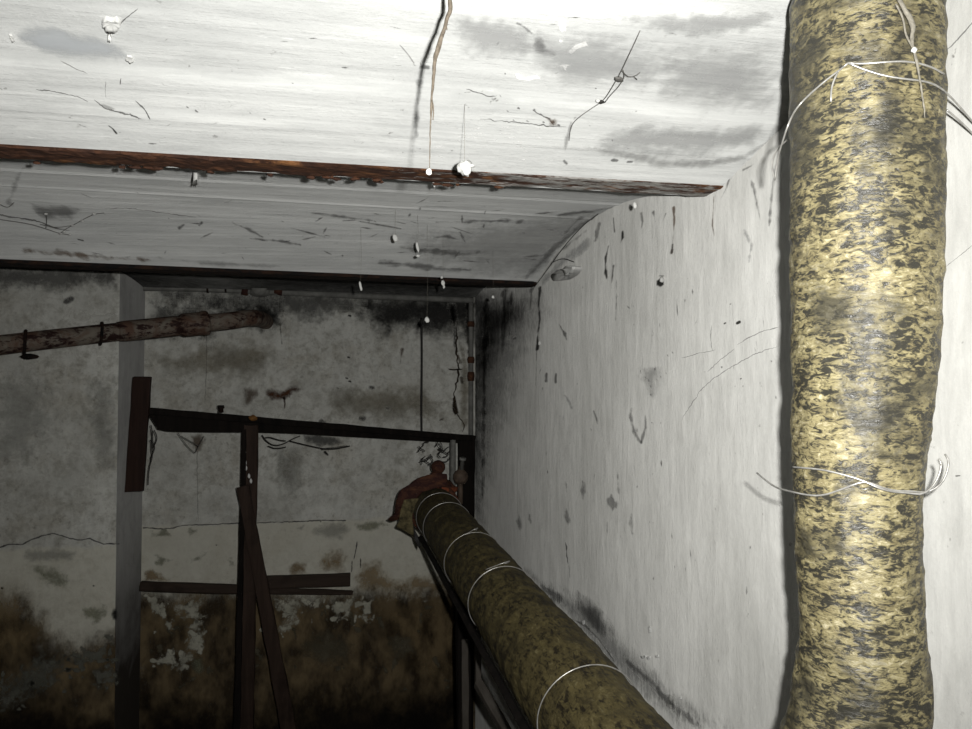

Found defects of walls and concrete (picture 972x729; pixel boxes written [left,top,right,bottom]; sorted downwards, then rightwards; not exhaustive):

damp [22,30,113,54]
crack [440,327,465,432]
crack [0,533,119,548]
damp [0,587,119,729]
damp [139,593,237,729]
damp [254,595,280,729]
damp [271,567,456,729]